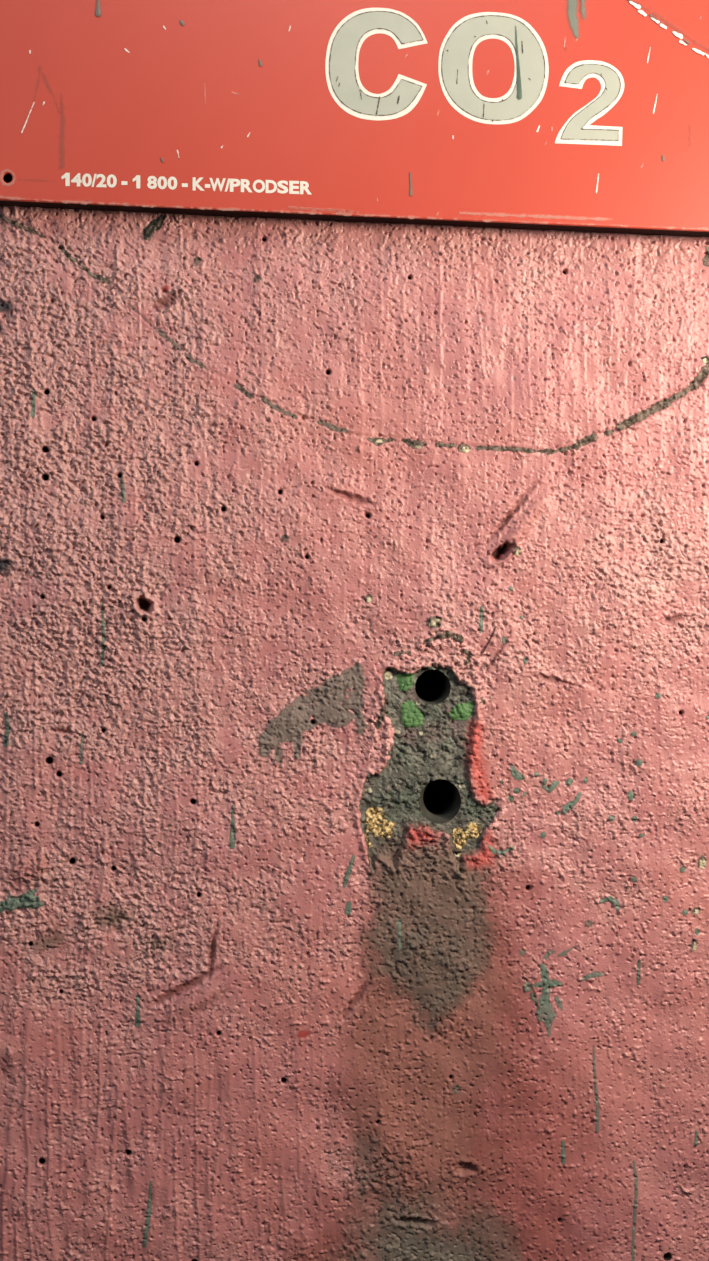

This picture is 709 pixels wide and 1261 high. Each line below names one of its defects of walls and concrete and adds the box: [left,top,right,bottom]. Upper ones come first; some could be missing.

crack [0,214,709,455]
spalling [359,616,506,880]